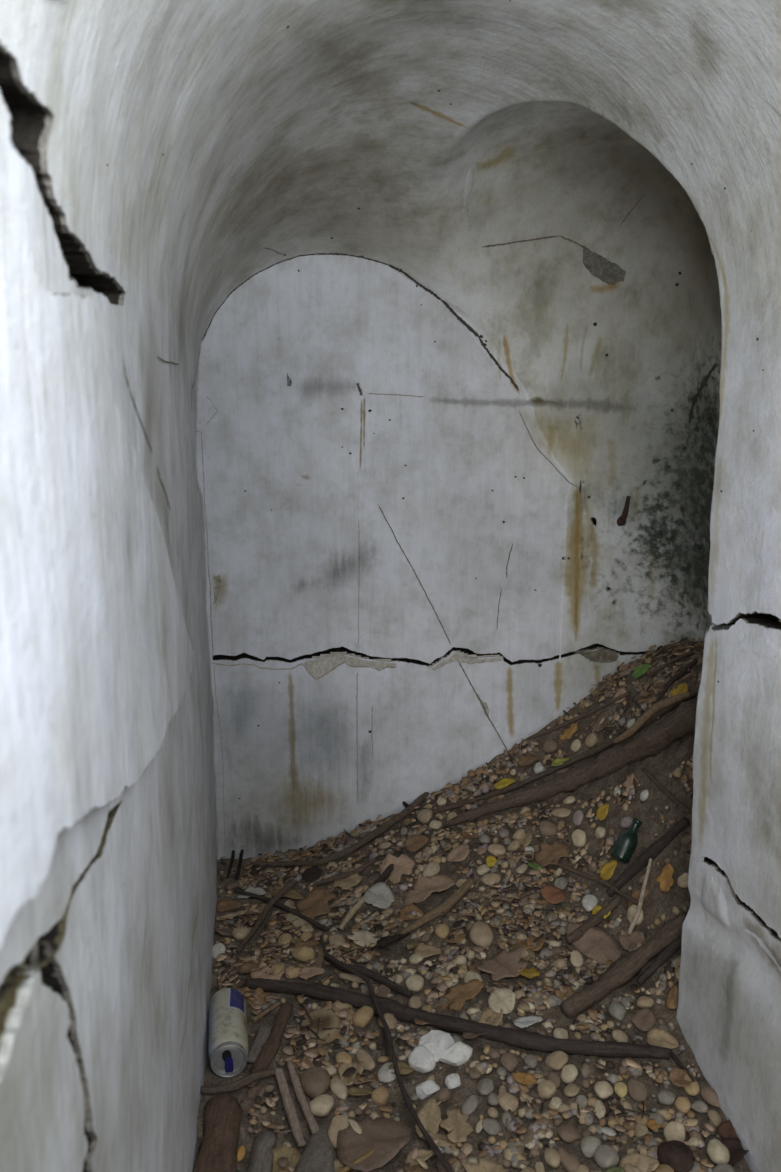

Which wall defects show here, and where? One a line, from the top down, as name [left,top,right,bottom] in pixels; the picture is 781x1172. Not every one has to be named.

crack [0,40,126,306]
spalling [582,245,626,286]
crack [519,412,578,488]
leakage [644,357,720,626]
crack [212,504,646,751]
crack [713,611,781,631]
crack [0,799,123,1172]
crack [697,856,781,941]